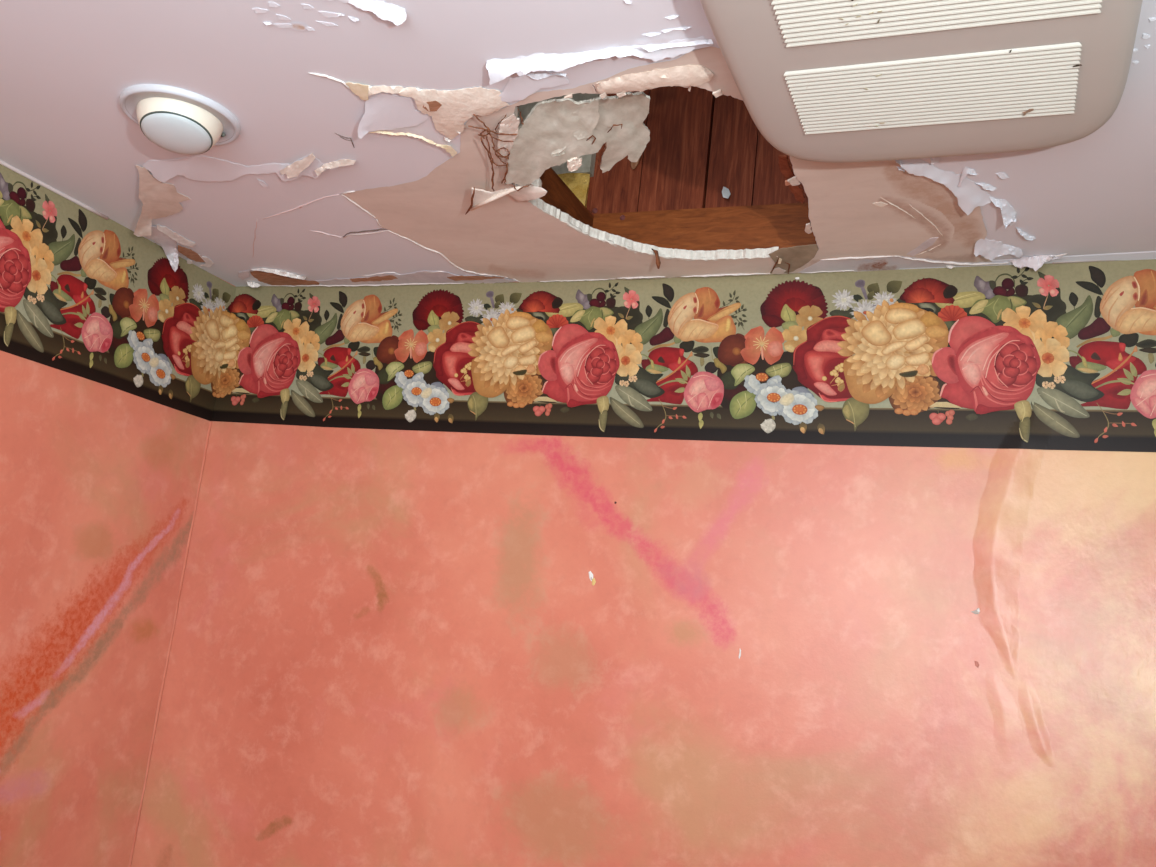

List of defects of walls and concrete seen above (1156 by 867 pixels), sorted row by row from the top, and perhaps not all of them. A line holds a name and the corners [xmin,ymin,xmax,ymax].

peeling [348,0,406,26]
peeling [143,153,356,188]
peeling [308,37,1036,282]